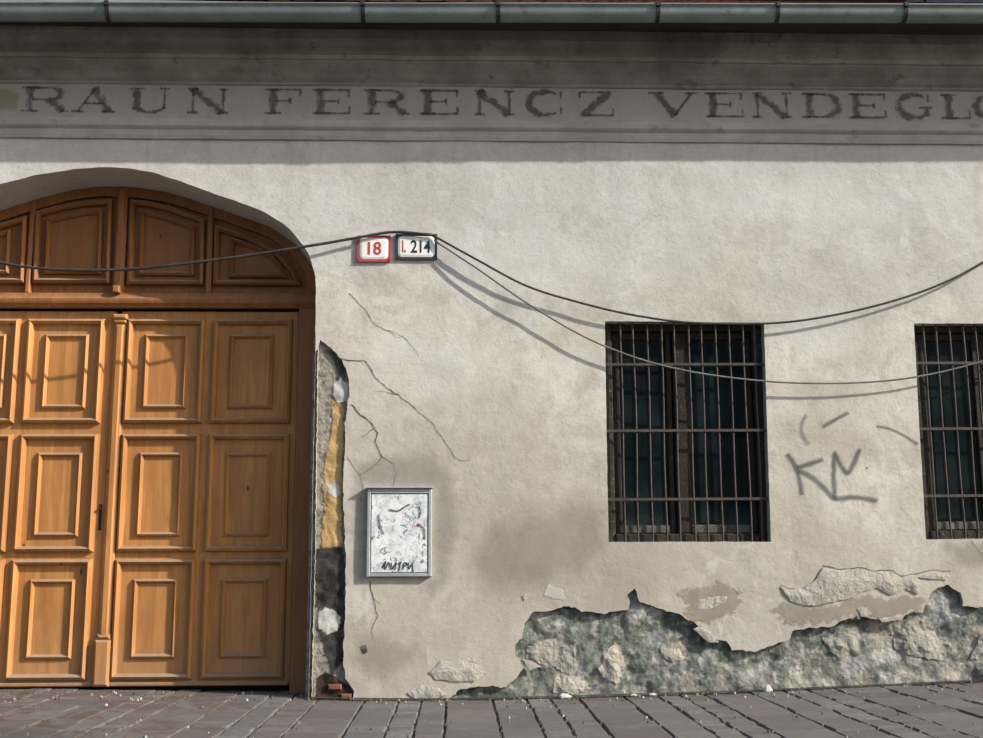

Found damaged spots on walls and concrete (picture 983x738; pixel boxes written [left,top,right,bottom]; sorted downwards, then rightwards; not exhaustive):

crack [347,404,396,502]
crack [339,358,468,461]
spalling [305,338,354,700]
spalling [448,579,983,700]